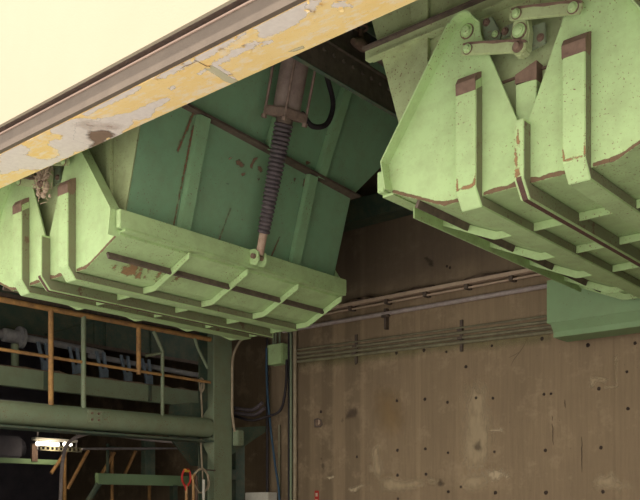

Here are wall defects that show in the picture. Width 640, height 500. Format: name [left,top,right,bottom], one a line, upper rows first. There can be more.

peeling [0,86,170,174]
leakage [88,130,113,147]
corrosion [392,178,476,206]
corrosion [483,130,640,267]